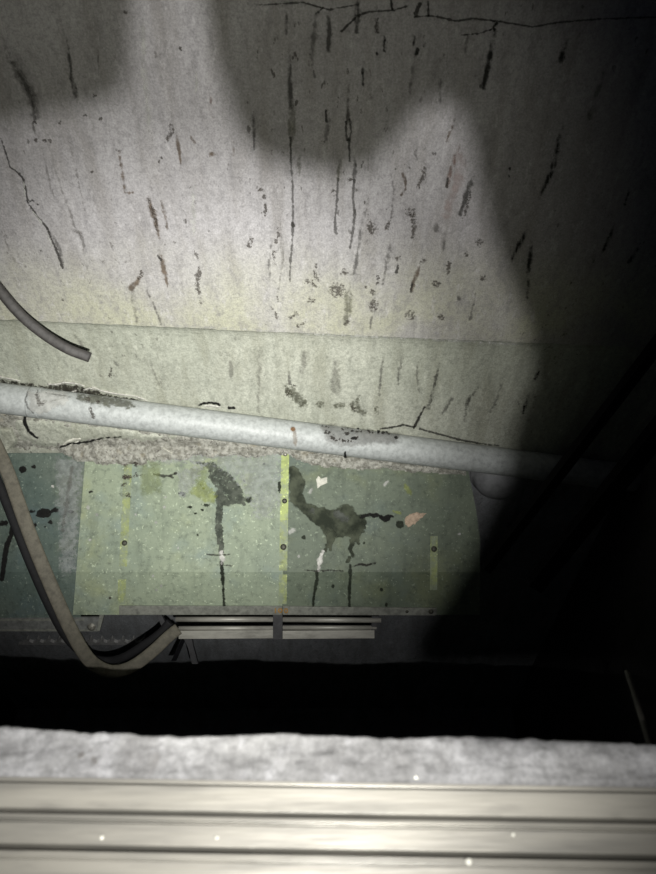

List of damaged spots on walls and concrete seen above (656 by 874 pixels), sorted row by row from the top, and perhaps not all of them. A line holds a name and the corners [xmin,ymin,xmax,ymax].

crack [260,0,656,35]
damp [479,24,496,90]
crack [1,140,64,269]
damp [459,181,473,219]
crack [382,406,499,446]
damp [187,462,252,606]
damp [278,466,404,607]